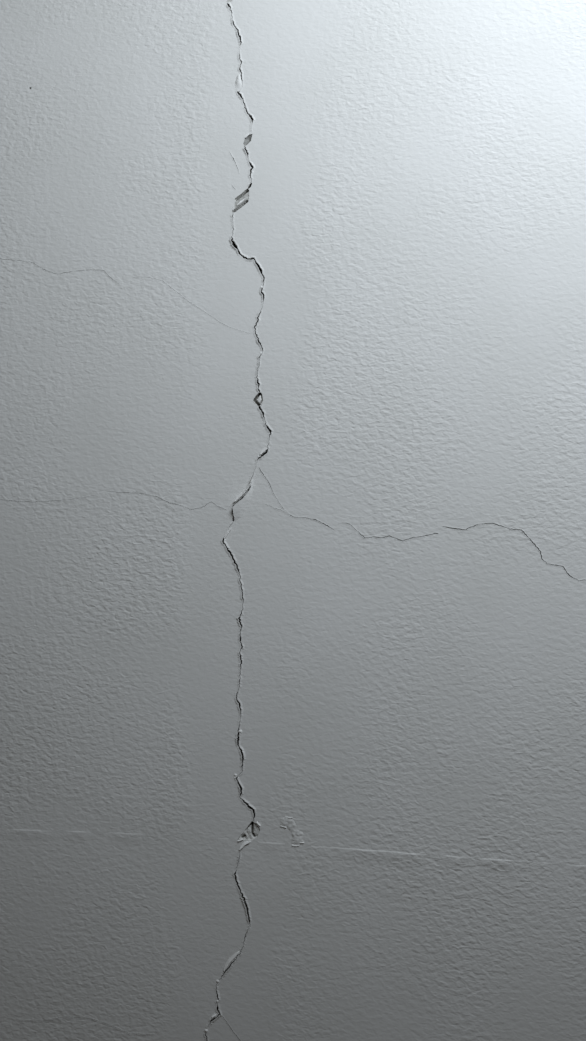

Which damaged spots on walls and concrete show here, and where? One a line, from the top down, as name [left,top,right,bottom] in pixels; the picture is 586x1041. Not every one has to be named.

crack [0,2,586,582]
crack [0,490,257,822]
crack [203,852,252,1041]